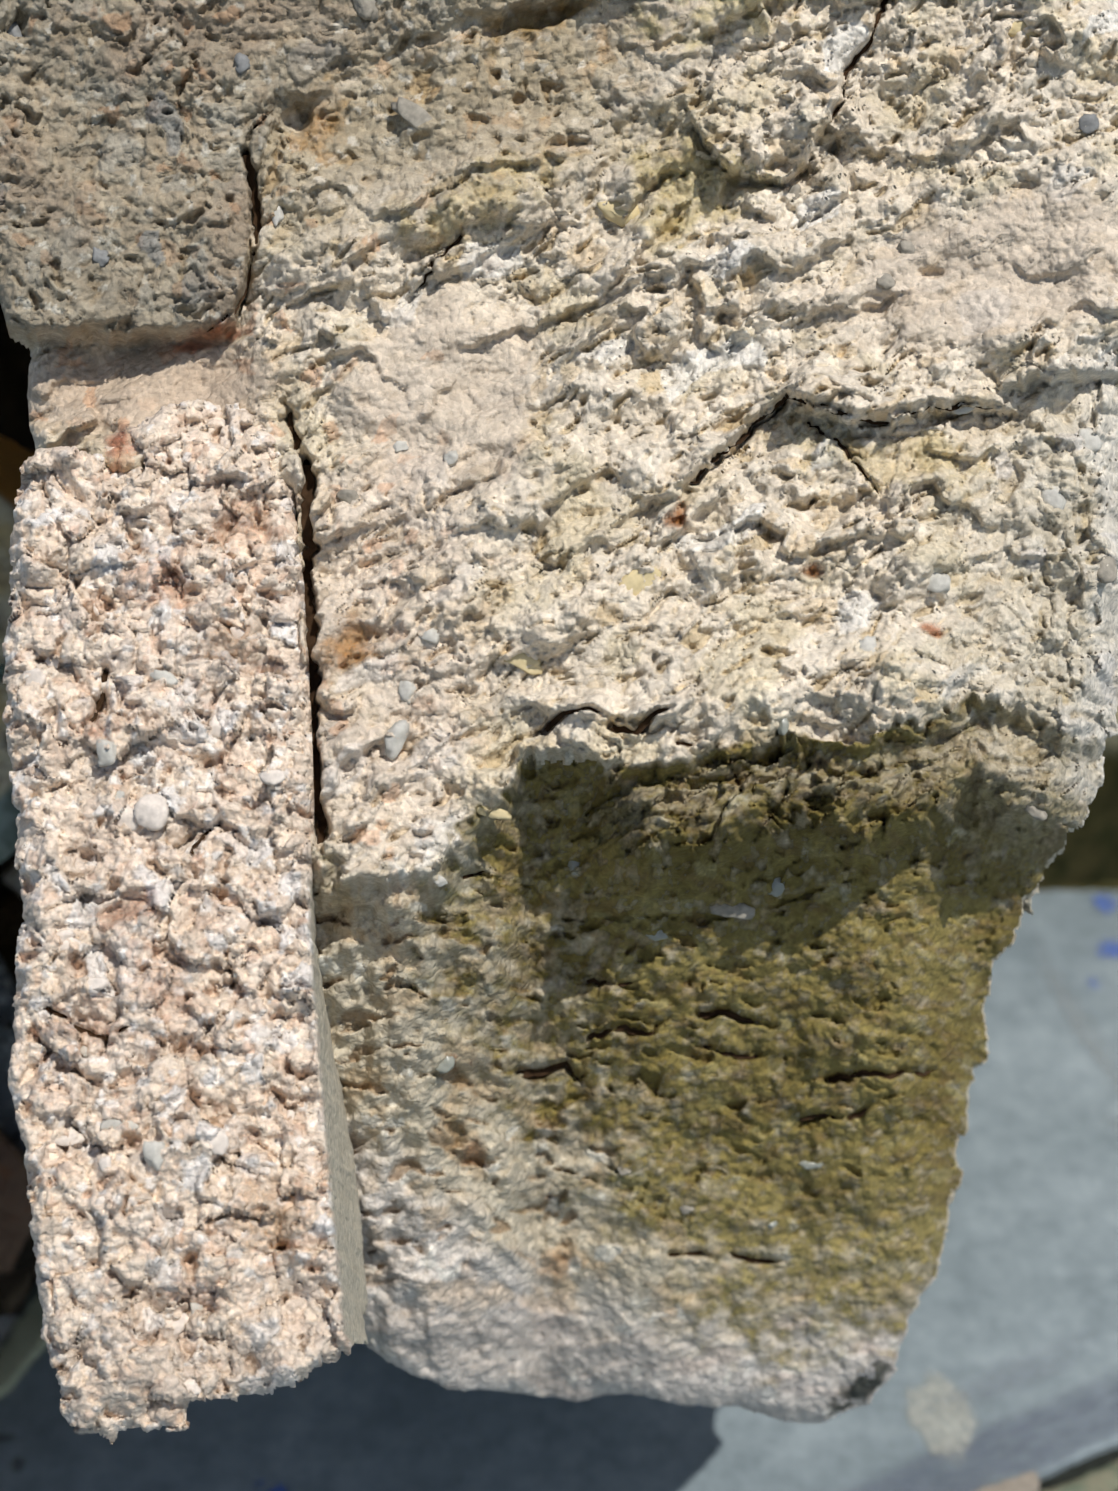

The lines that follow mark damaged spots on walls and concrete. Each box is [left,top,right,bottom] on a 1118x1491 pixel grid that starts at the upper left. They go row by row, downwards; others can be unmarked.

crack [13,0,1118,887]
leakage [382,1321,593,1380]
leakage [420,697,1069,1365]
leakage [909,1375,978,1454]